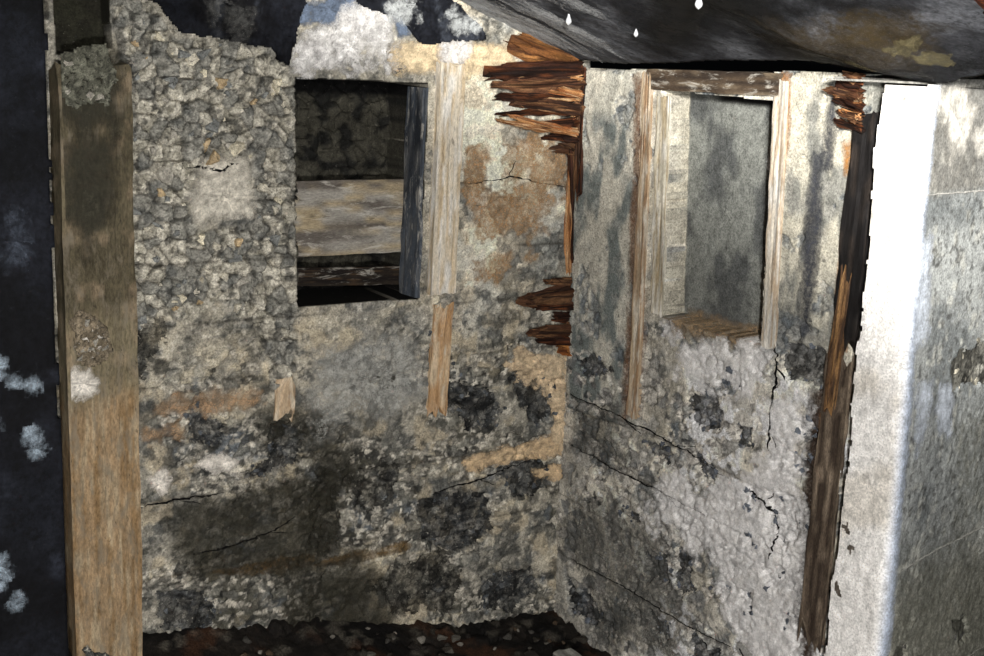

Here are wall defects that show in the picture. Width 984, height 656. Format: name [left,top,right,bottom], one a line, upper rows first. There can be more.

peeling [356,0,486,45]
spalling [60,43,118,109]
peeling [148,0,307,165]
spalling [137,234,250,395]
water stain [566,0,984,656]
water stain [149,469,171,496]
water stain [166,339,421,628]
water stain [513,346,627,482]
crack [571,445,704,515]
crack [571,394,723,476]
crack [749,490,780,559]
crack [767,348,786,451]